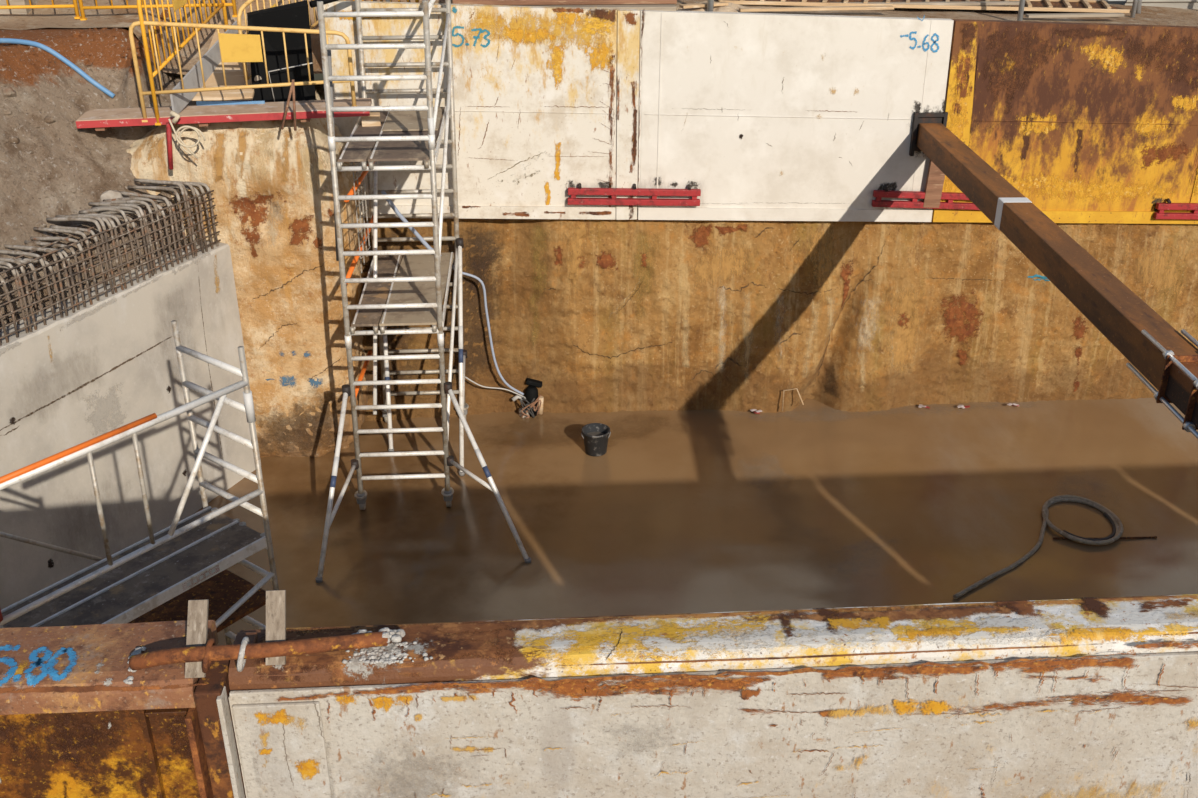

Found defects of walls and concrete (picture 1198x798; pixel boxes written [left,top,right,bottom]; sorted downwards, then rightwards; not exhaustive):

peeling [466,8,614,89]
rust [553,7,644,66]
rust [953,23,1198,114]
rust [503,56,641,217]
rust [1020,116,1033,160]
rust [1074,129,1083,172]
rust [1141,142,1189,169]
rust [941,290,984,366]
rust [1072,316,1089,392]
rust [0,683,208,693]
rust [252,594,1198,723]
peeling [513,611,1198,668]